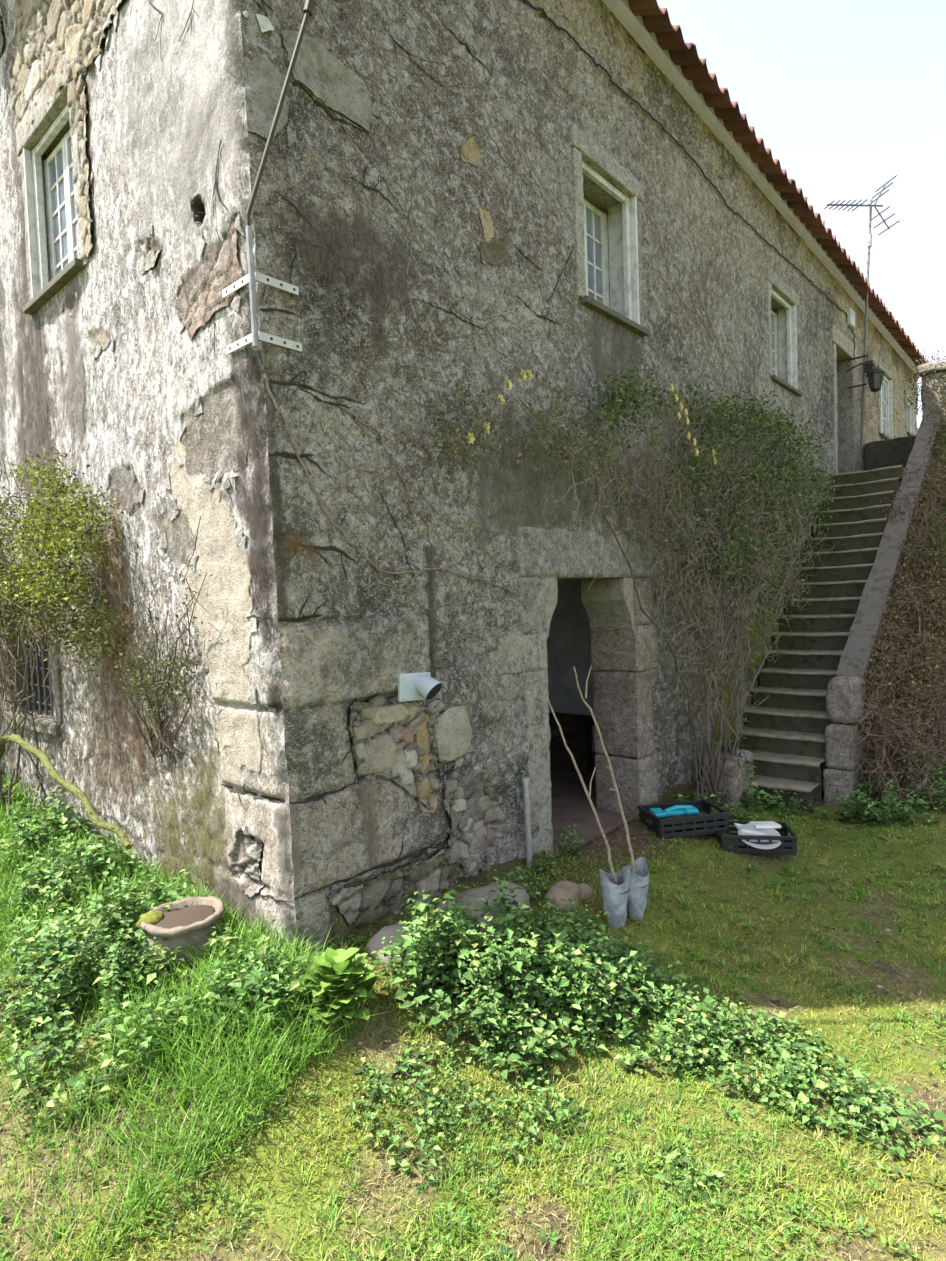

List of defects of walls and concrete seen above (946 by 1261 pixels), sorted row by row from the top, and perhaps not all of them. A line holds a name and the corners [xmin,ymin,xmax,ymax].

crack [148,0,198,62]
crack [441,23,492,75]
spalling [0,0,121,266]
spalling [175,193,245,340]
crack [212,130,279,249]
spalling [474,208,514,266]
crack [513,243,576,326]
leakage [0,174,84,533]
leakage [227,283,287,636]
leakage [267,683,280,713]
spalling [227,825,265,897]
spalling [328,693,508,929]